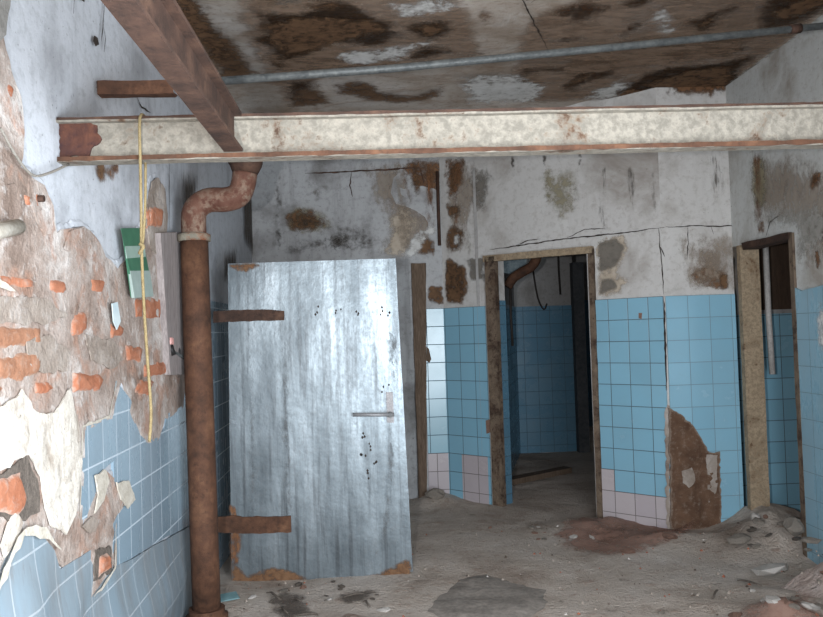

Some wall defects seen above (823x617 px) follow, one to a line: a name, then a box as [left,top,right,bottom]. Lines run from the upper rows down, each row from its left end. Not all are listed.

leakage [176,0,479,107]
crack [522,0,547,48]
leakage [515,0,823,102]
corrosion [59,123,102,157]
corrosion [97,165,119,180]
flaking render [0,36,185,597]
flaking render [428,259,468,304]
flaking render [596,235,627,296]
crack [491,225,732,390]
leakage [688,237,732,284]
flaking render [664,405,722,530]
corrosion [231,533,304,581]